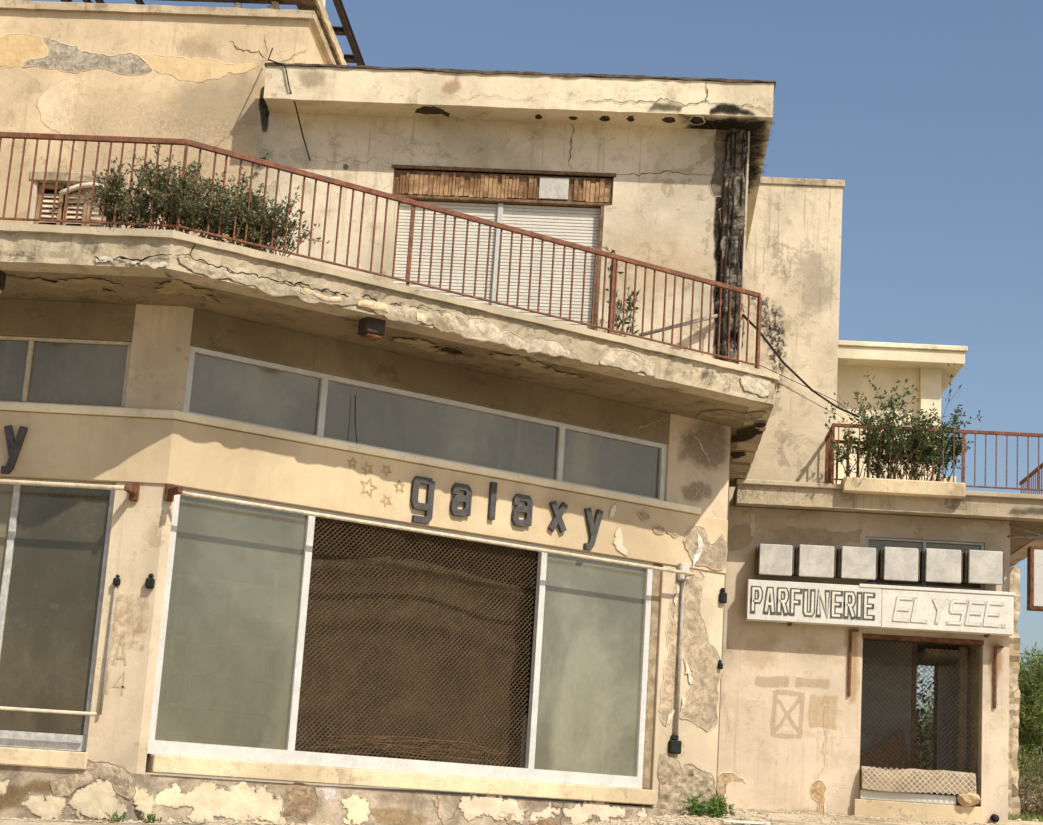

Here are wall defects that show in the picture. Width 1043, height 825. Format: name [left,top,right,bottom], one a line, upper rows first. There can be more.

spalling [0,33,261,152]
crack [436,87,769,115]
damp [713,197,722,345]
spalling [94,254,583,380]
peeling [599,348,657,377]
spalling [637,509,864,732]
peeling [0,779,9,797]
peeling [20,758,319,823]
peeling [338,794,371,825]